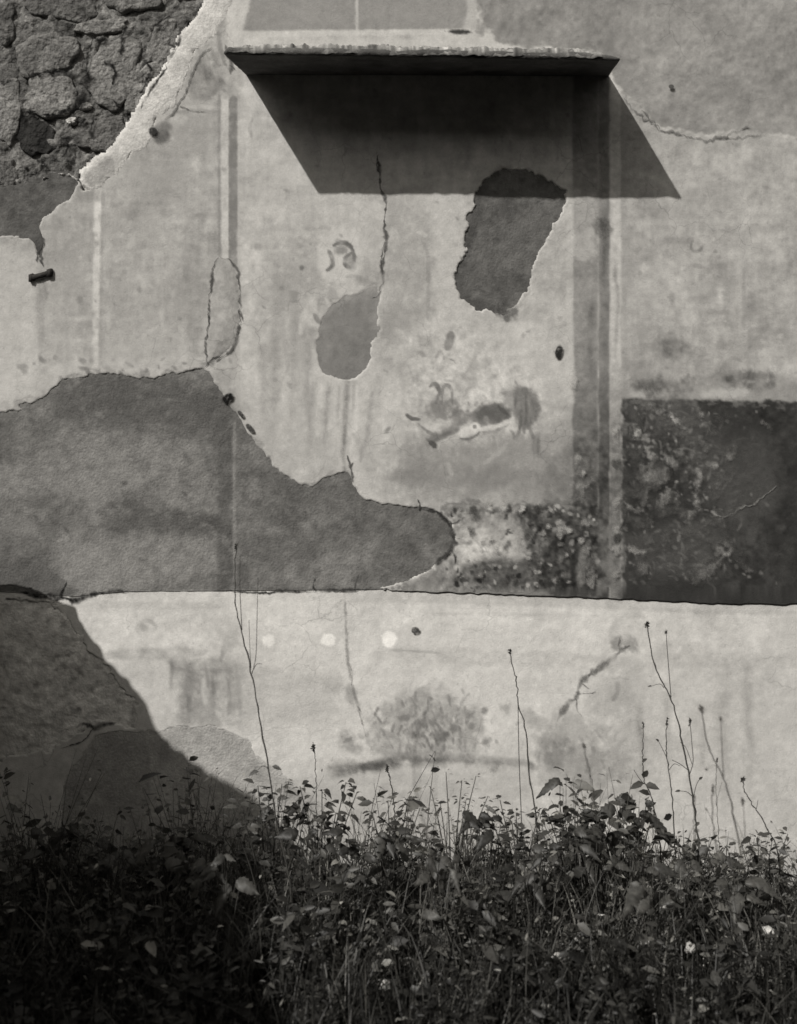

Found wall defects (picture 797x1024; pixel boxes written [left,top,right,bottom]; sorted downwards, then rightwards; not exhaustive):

flaking render [0,0,203,190]
crack [634,110,753,142]
crack [373,157,388,298]
crack [204,257,243,368]
crack [23,582,127,603]
crack [235,579,367,594]